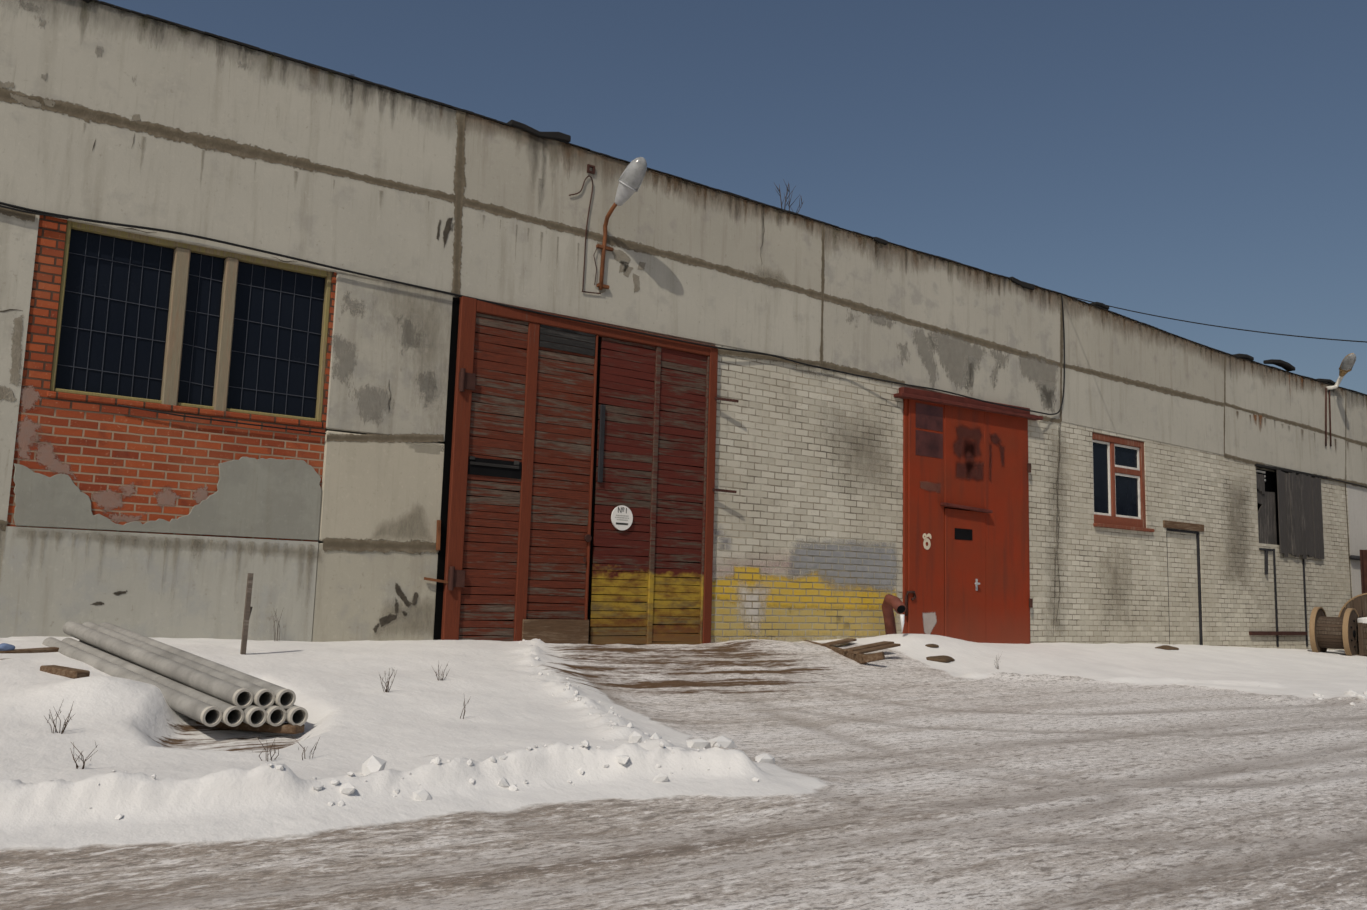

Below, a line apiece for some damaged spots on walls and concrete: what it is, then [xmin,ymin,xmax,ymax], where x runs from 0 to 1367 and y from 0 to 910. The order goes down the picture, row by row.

spalling [0,315,325,540]